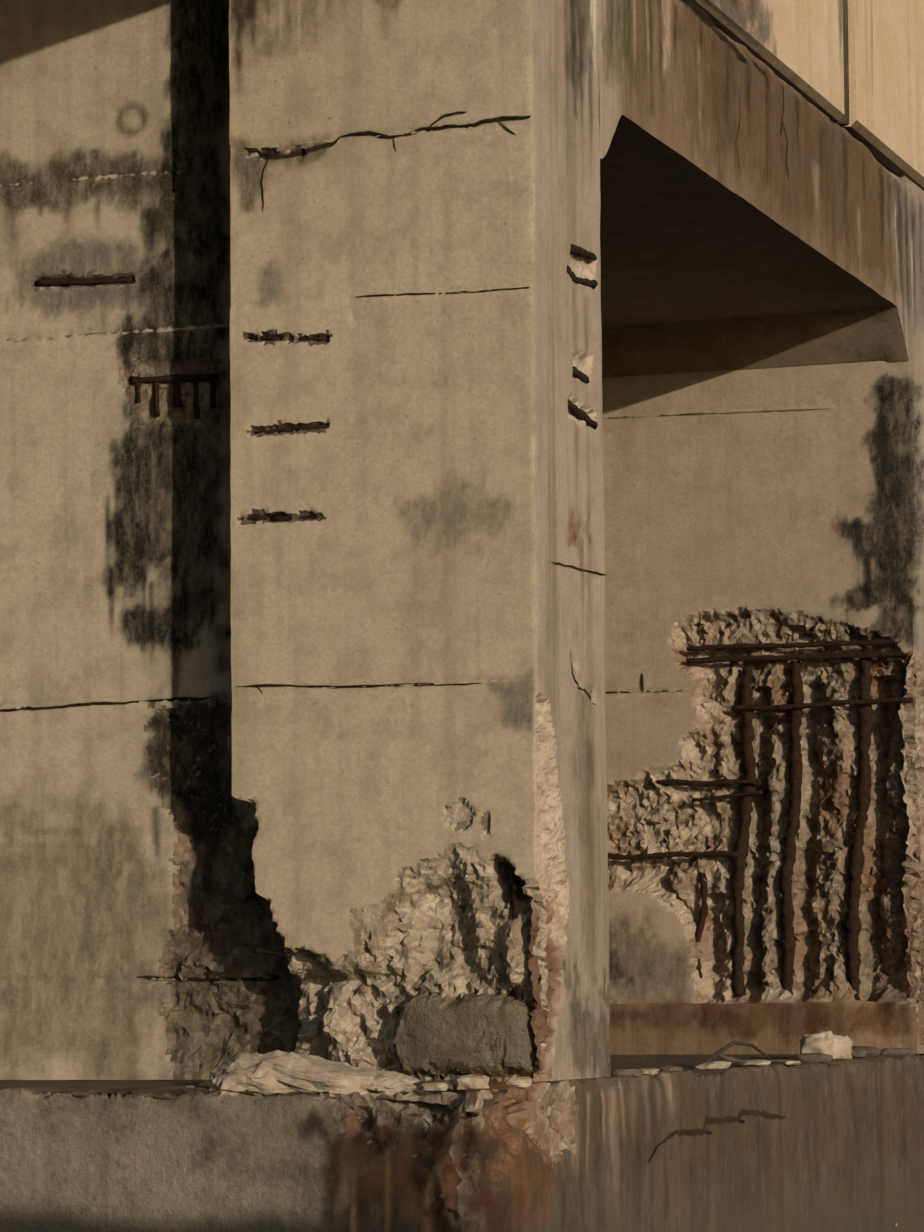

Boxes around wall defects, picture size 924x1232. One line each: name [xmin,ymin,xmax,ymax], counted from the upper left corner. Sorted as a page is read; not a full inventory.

leakage [573,0,597,51]
crack [244,111,531,211]
leakage [0,0,255,688]
leakage [834,376,924,644]
leakage [145,694,237,860]
spalling [607,606,924,1045]
spalling [143,693,579,1232]
crack [649,1109,785,1162]